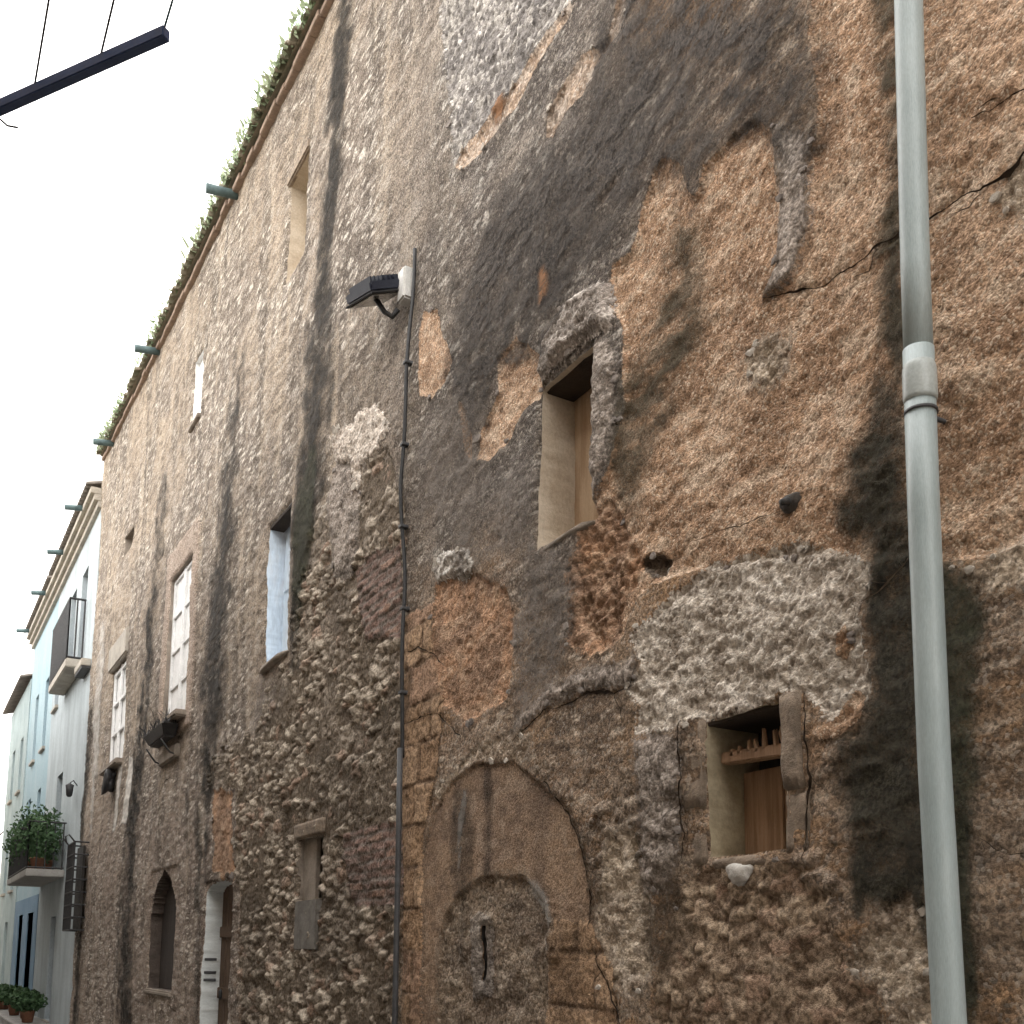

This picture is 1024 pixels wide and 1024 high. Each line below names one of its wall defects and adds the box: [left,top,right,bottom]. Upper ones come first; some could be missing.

flaking render [458,336,544,461]
flaking render [439,0,575,171]
leakage [612,225,702,500]
flaking render [563,0,907,741]
crack [762,232,899,298]
flaking render [923,0,1024,602]
crack [929,151,1024,220]
leakage [112,476,167,1024]
leakage [186,353,244,912]
flaking render [427,546,517,728]
crack [533,774,620,1024]
crack [801,693,820,860]